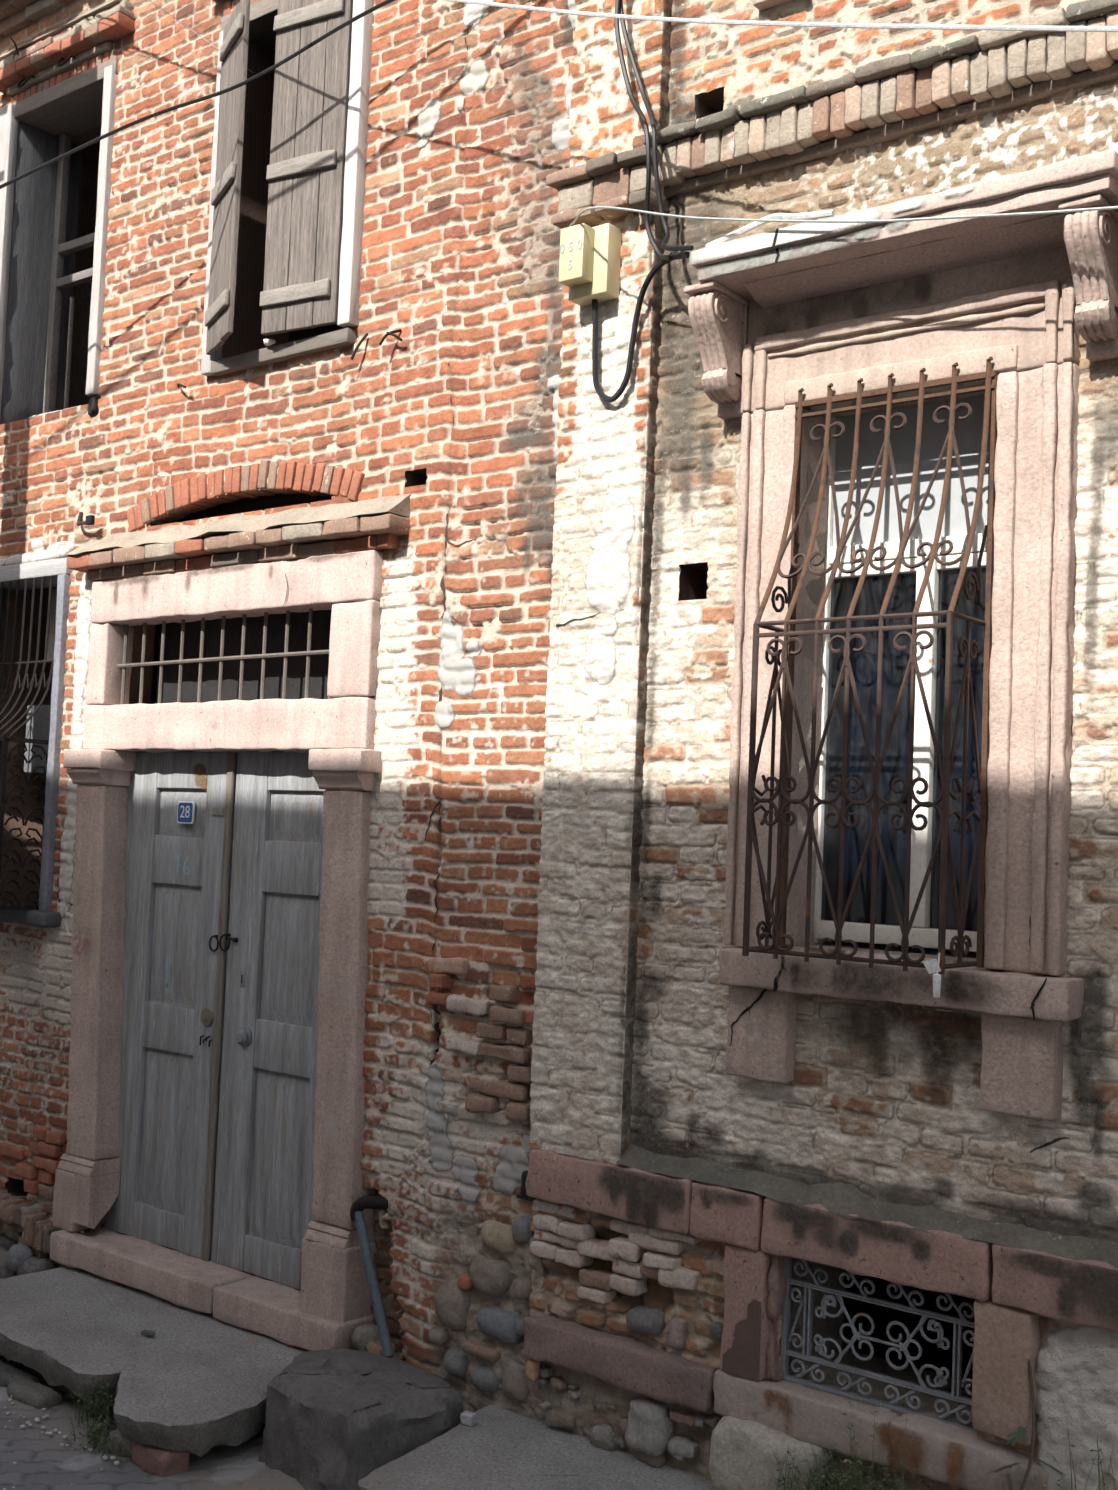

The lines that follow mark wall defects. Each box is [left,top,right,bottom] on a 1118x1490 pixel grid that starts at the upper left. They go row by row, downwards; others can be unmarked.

spalling [426,957,533,1122]
crack [730,955,785,1046]
leakage [847,972,972,1095]
crack [1029,978,1047,1020]
leakage [1070,968,1106,1153]
peeling [452,1155,482,1202]
leakage [775,1203,928,1260]
leakage [797,1175,951,1205]
leakage [984,1185,1118,1238]
spalling [428,1200,703,1401]
spalling [709,1255,805,1382]
leakage [1017,1253,1118,1319]